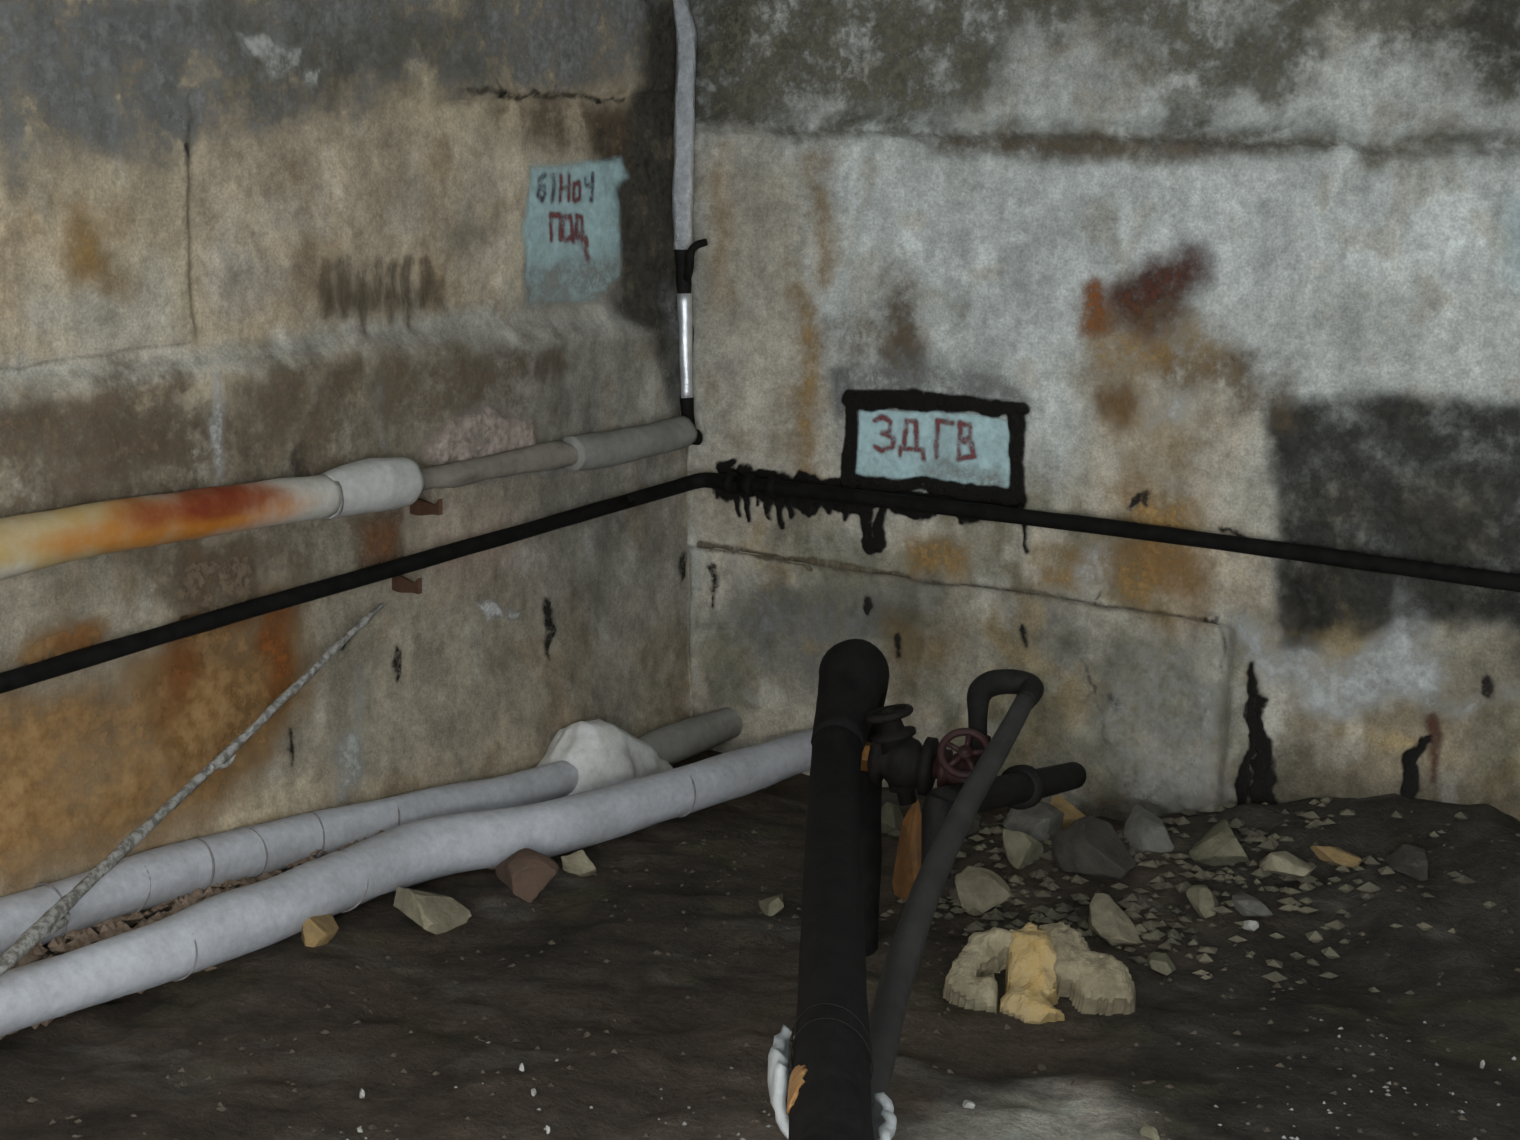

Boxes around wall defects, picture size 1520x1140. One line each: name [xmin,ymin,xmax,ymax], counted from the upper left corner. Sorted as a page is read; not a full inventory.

crack [467,81,625,102]
damp [695,0,1520,157]
damp [0,0,694,422]
rust [1082,248,1241,382]
rust [174,547,256,612]
damp [1235,386,1520,780]
rust [0,609,298,879]